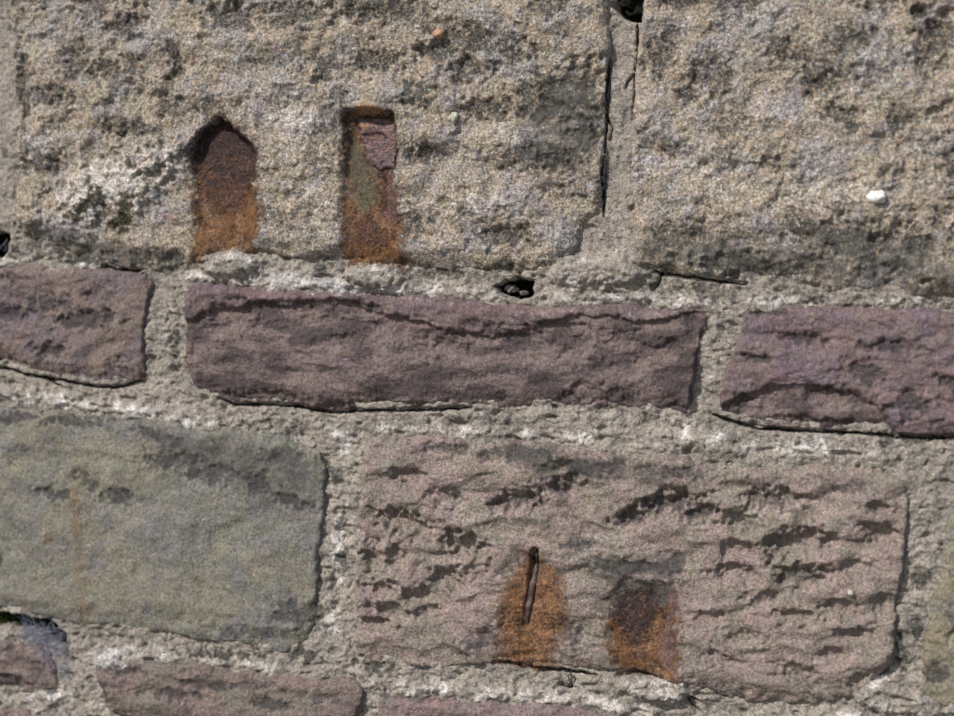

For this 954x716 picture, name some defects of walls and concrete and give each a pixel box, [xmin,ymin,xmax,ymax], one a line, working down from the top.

rust [184,113,266,263]
rust [337,102,412,267]
crack [600,24,638,217]
rust [489,546,574,672]
rust [601,584,684,684]